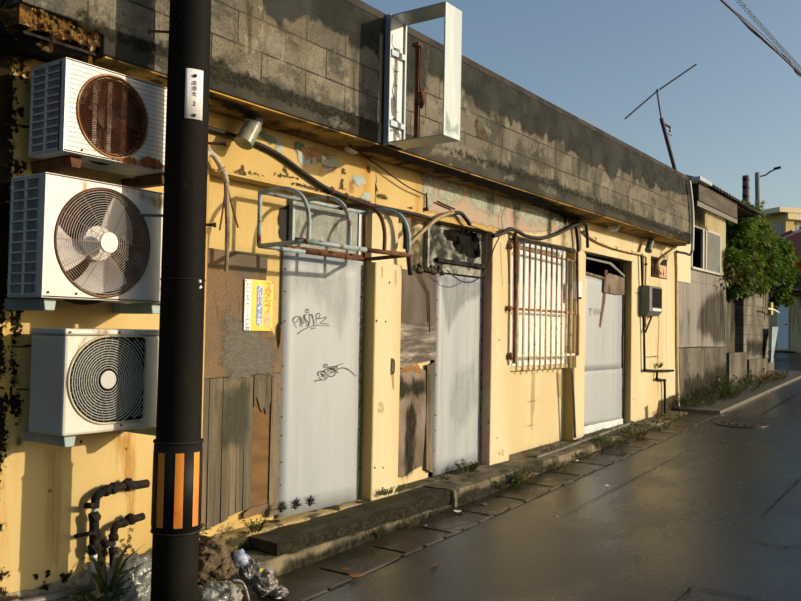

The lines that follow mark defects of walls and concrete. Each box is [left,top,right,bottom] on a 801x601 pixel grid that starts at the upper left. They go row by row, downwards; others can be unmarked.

damp [263,0,386,125]
damp [406,33,444,94]
rust [112,156,165,169]
peeling [258,130,283,153]
peeling [274,142,389,203]
damp [461,61,690,195]
peeling [0,54,31,489]
damp [698,288,736,343]
damp [682,354,727,402]
damp [747,340,766,356]
damp [399,379,426,477]
peeling [0,562,109,601]